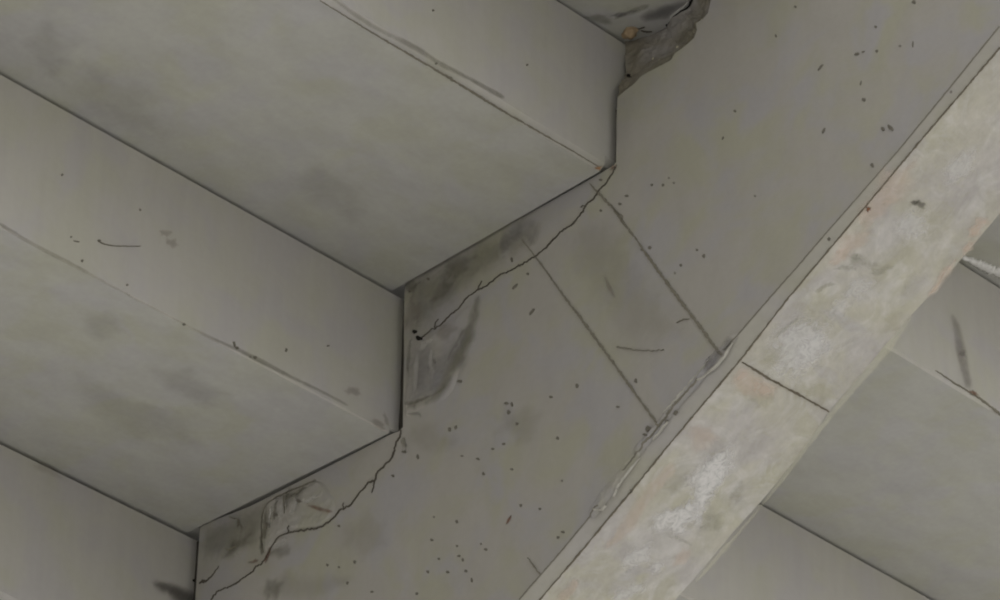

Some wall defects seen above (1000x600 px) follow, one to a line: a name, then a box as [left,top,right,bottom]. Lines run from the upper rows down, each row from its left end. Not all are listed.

spalling [618,0,711,96]
crack [421,167,616,338]
crack [199,430,402,600]